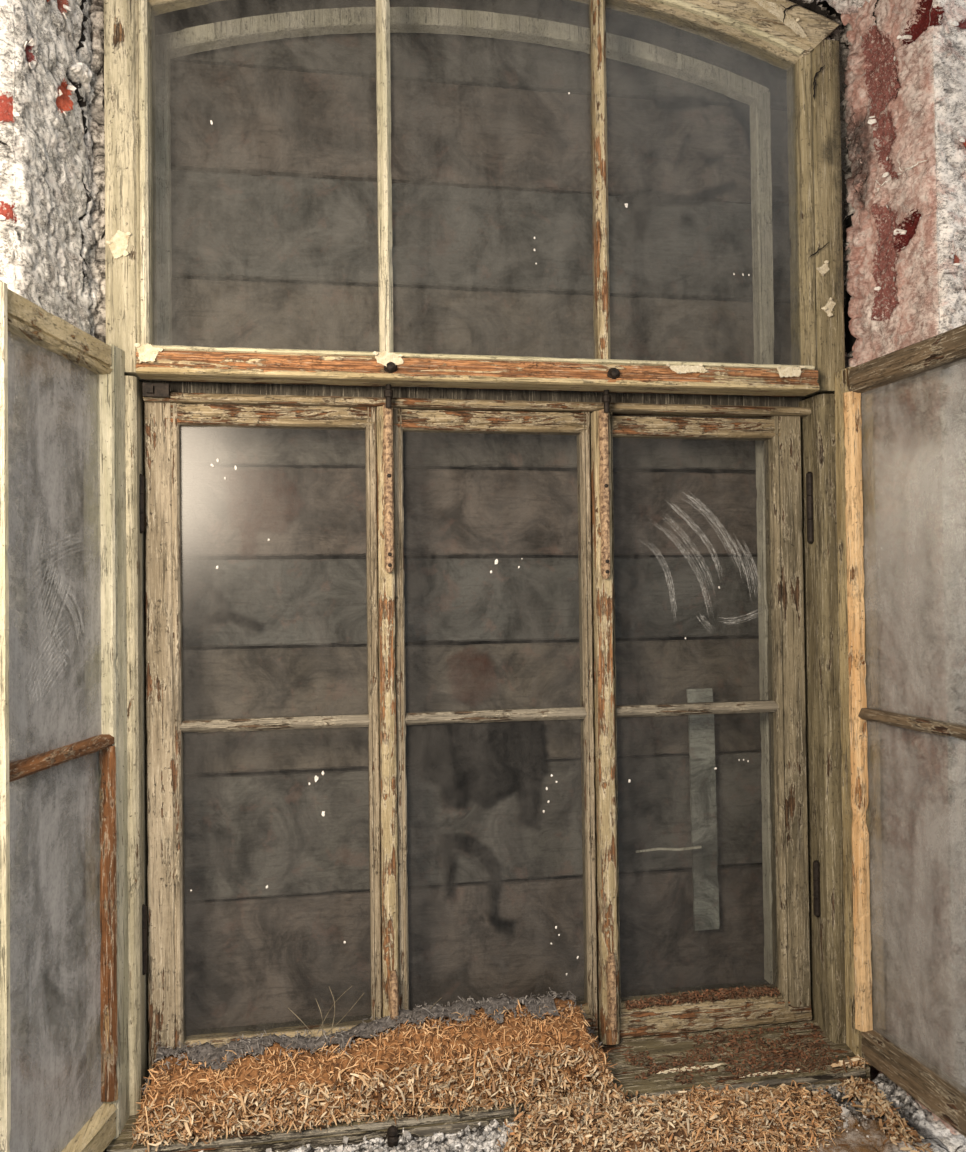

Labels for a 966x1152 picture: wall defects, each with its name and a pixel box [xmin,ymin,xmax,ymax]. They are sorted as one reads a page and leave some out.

spalling [46,0,71,19]
spalling [56,62,93,116]
crack [66,0,105,142]
spalling [860,0,966,179]
spalling [0,201,20,223]
crack [78,167,105,278]
spalling [871,203,922,321]